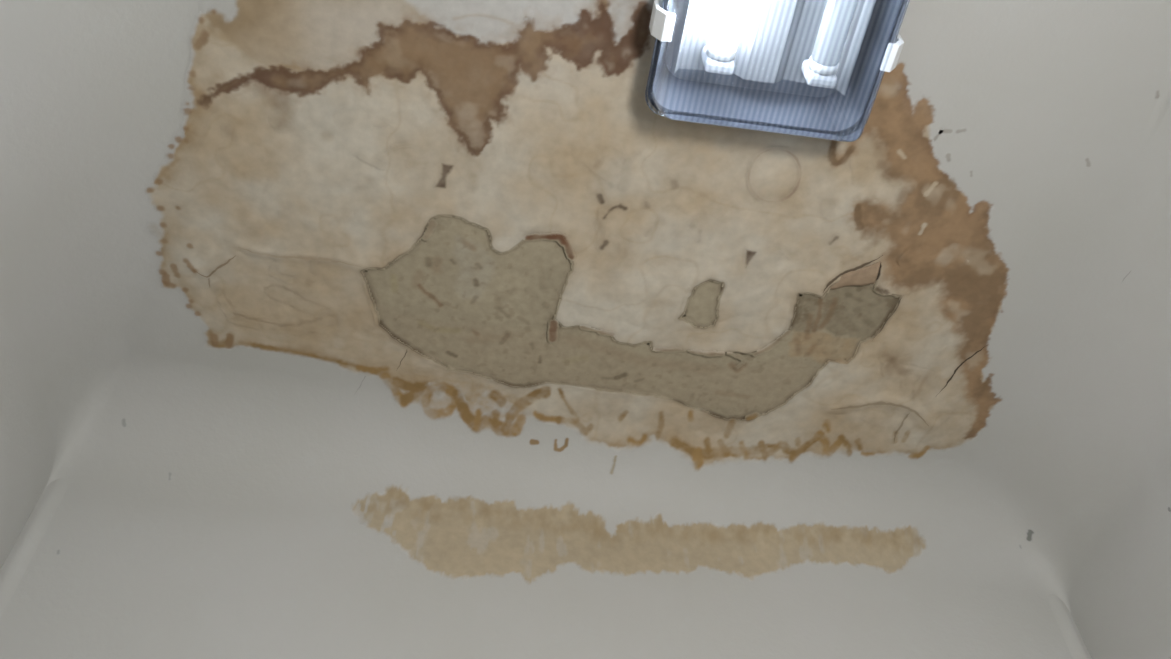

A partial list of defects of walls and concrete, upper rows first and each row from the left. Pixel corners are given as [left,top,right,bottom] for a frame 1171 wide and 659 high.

leakage [144,0,1013,476]
peeling [357,211,905,424]
crack [937,345,987,395]
leakage [350,482,928,586]